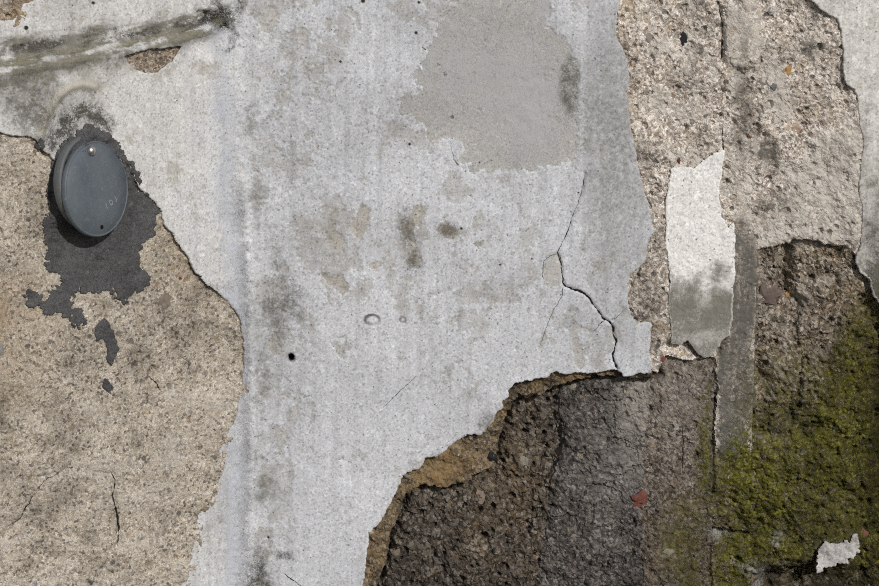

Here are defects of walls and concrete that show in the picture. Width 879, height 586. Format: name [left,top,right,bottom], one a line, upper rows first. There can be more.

spalling [0,0,34,30]
spalling [125,46,180,73]
peeling [325,204,371,253]
peeling [321,272,350,295]
crack [540,180,627,369]
spalling [363,0,879,586]
spalling [0,132,249,586]
damp [669,222,758,460]
crack [111,472,120,546]